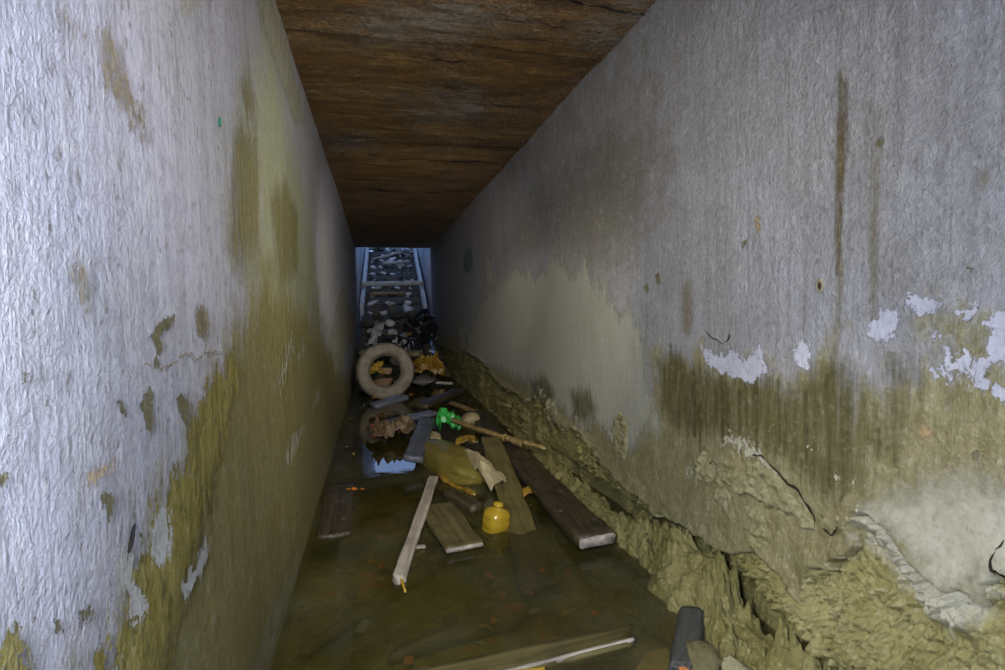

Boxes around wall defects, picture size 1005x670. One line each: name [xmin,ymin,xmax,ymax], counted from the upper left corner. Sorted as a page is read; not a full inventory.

damp [63,13,146,142]
damp [231,77,259,267]
rust [836,73,847,274]
crack [140,349,224,374]
damp [458,251,880,496]
peeling [864,291,1005,405]
peeling [93,335,244,670]
spalling [435,344,1005,670]
crack [753,454,837,536]
damp [846,479,1005,591]
crack [988,540,1005,578]
peeling [0,613,44,670]